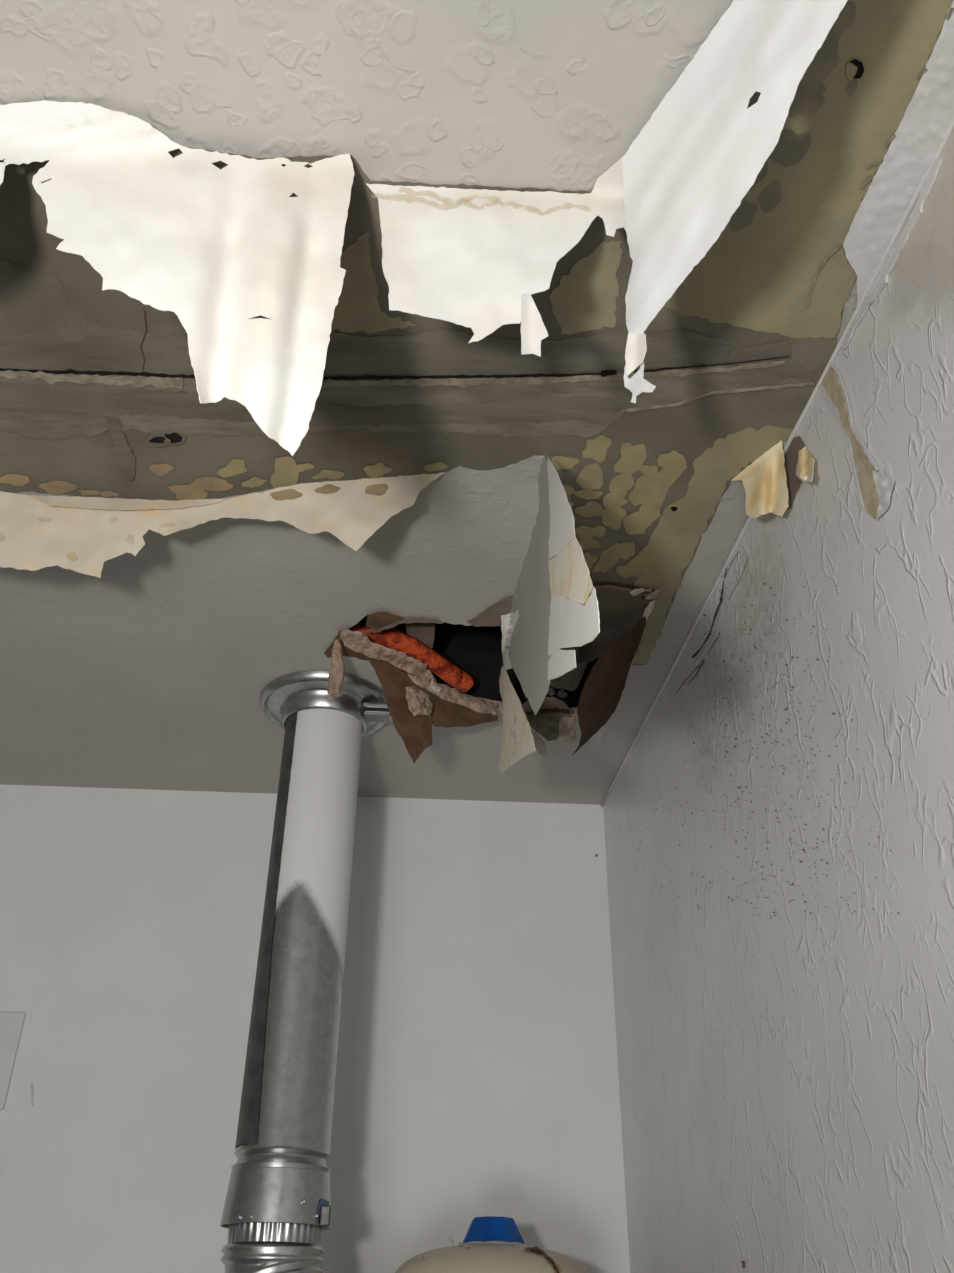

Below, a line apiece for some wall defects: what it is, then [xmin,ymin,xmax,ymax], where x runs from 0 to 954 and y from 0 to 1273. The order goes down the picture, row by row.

peeling [0,0,954,665]
spalling [426,622,528,706]
spalling [545,657,599,708]
damp [690,571,864,919]